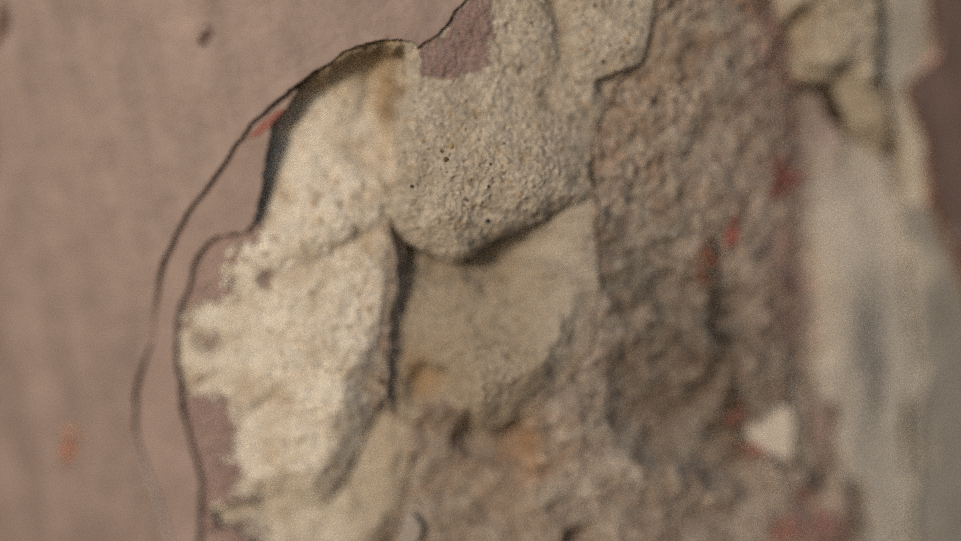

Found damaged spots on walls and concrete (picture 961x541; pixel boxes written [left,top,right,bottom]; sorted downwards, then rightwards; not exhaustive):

flaking render [174,39,422,541]
crack [493,212,561,243]
crack [590,164,598,222]
flaking render [801,140,920,541]